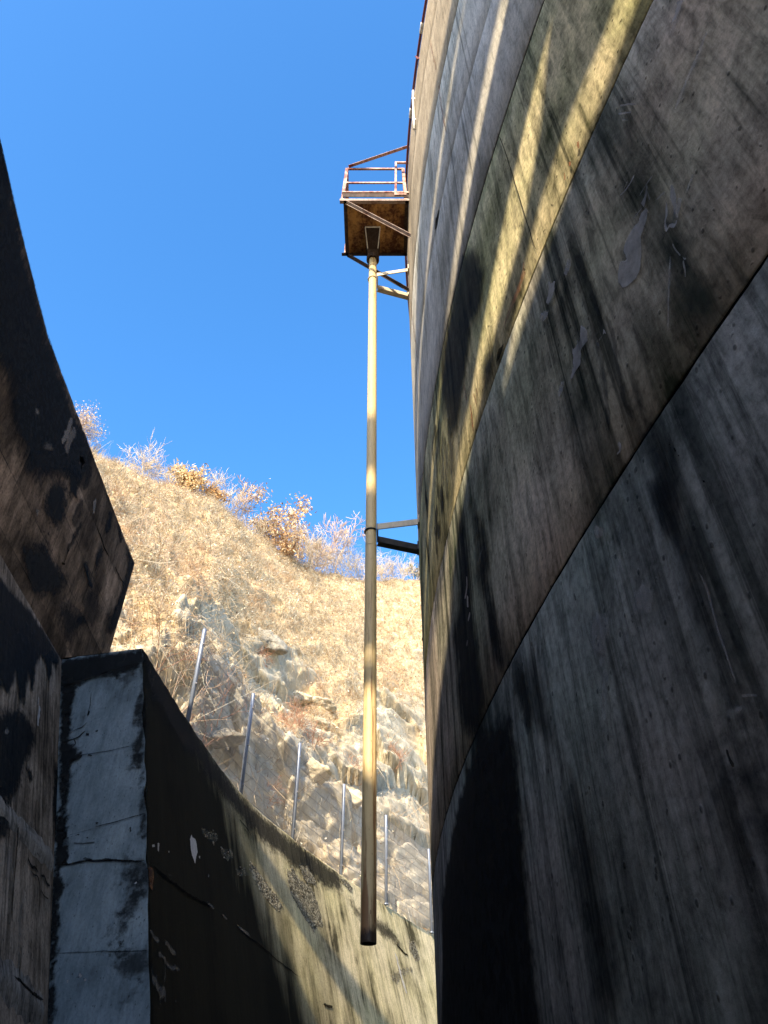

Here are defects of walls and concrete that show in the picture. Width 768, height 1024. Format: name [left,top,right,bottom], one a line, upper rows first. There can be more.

peeling [618,176,652,288]
water stain [0,139,92,641]
water stain [105,511,135,631]
peeling [190,835,198,862]